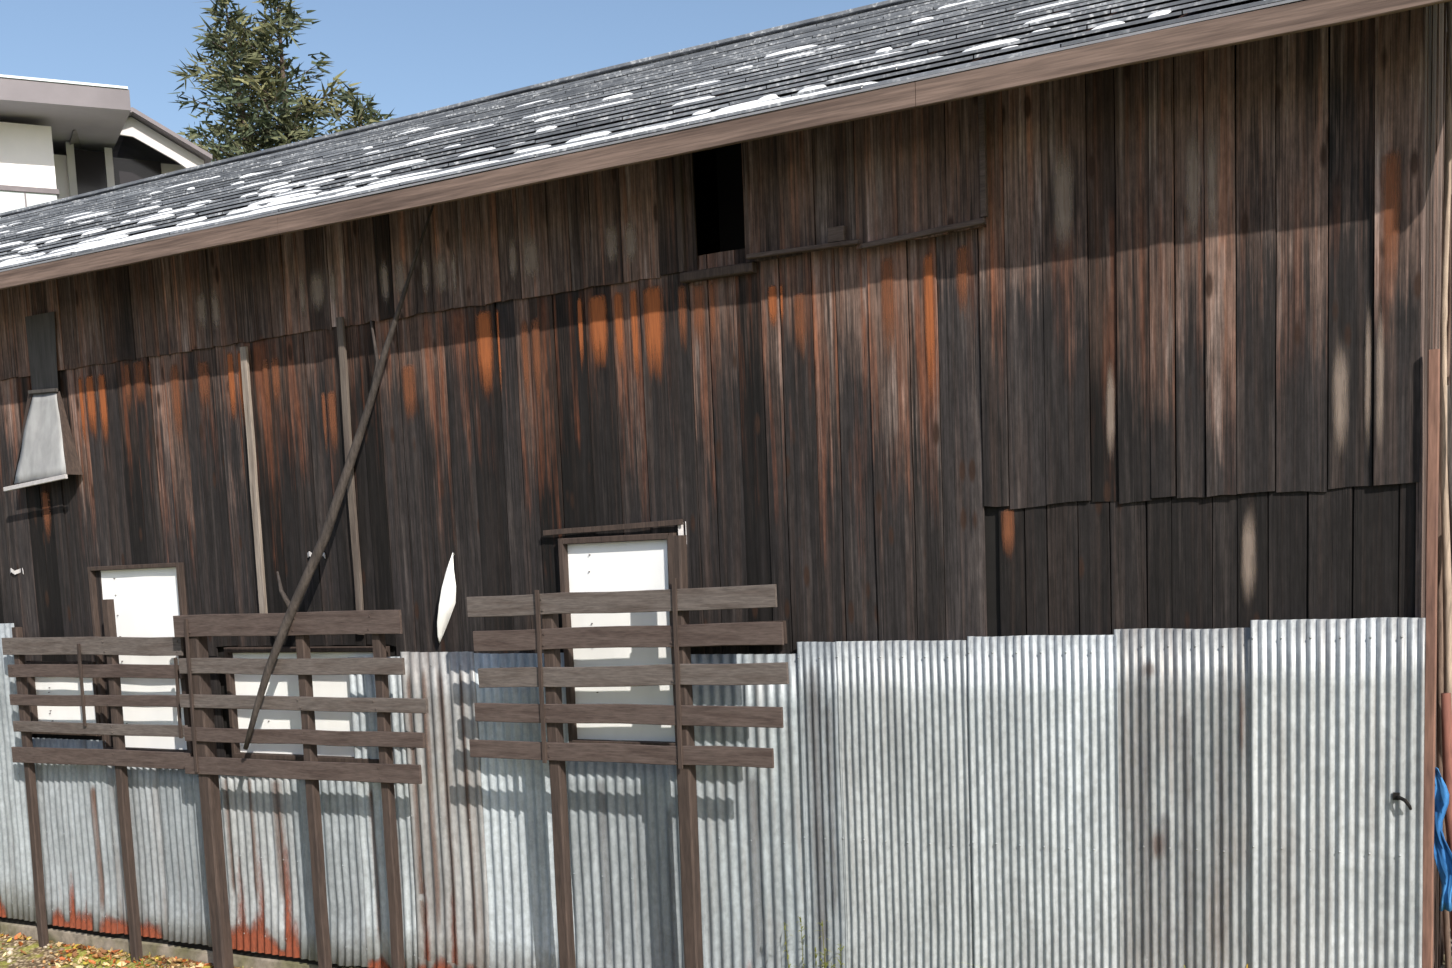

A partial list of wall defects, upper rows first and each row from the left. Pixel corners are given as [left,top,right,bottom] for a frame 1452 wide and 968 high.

corrosion [52,887,162,939]
corrosion [231,862,300,958]
corrosion [368,904,472,968]